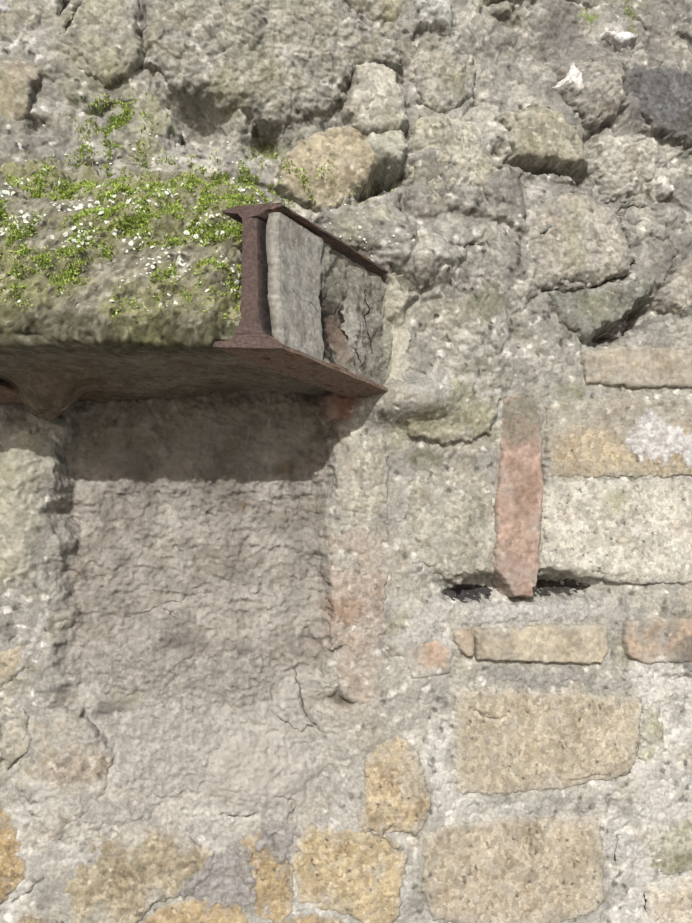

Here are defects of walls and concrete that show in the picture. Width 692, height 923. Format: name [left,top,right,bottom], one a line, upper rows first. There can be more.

crack [292,288,373,362]
crack [272,668,330,734]